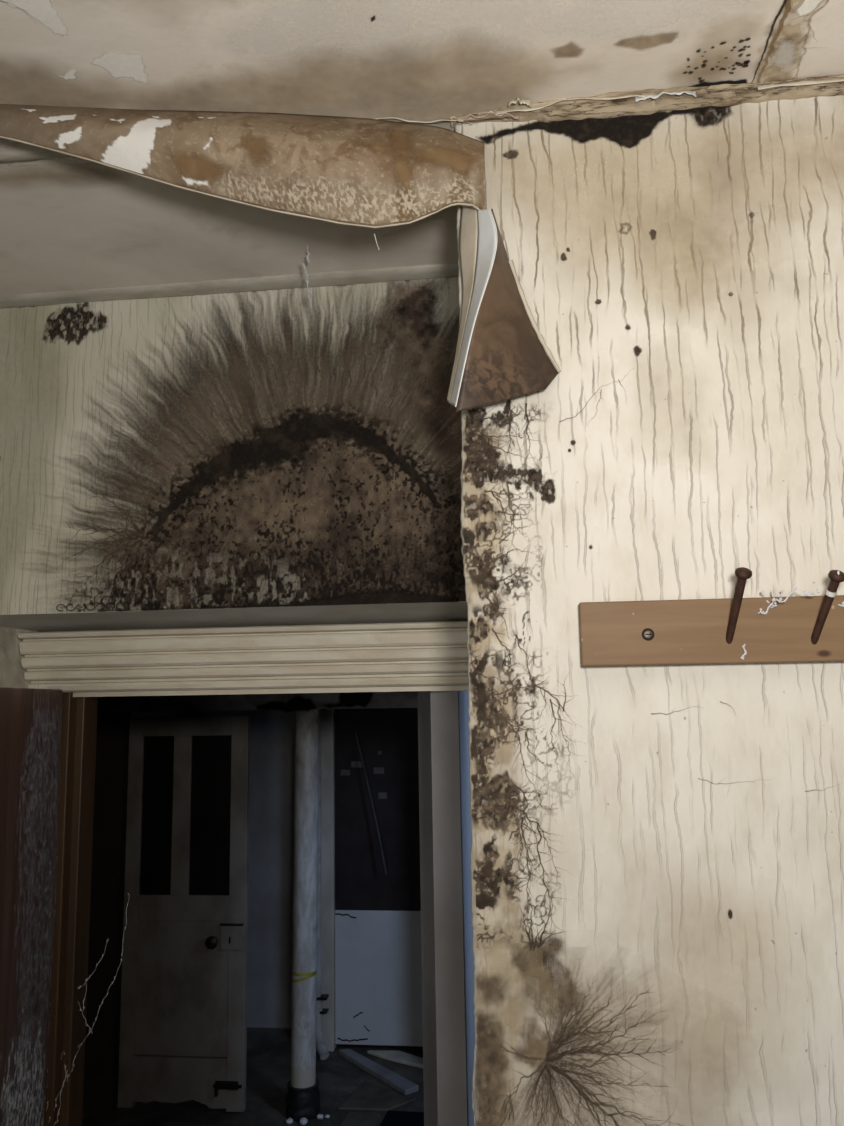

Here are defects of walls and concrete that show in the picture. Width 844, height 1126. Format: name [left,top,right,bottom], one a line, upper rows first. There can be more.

peeling [91,52,148,83]
leakage [556,44,580,56]
leakage [618,34,676,48]
leakage [683,38,751,83]
peeling [758,78,844,90]
peeling [376,117,476,125]
leakage [479,106,731,148]
leakage [43,302,107,344]
leakage [62,281,497,612]
leakage [257,692,373,712]
leakage [471,624,513,834]
leakage [476,892,681,1126]